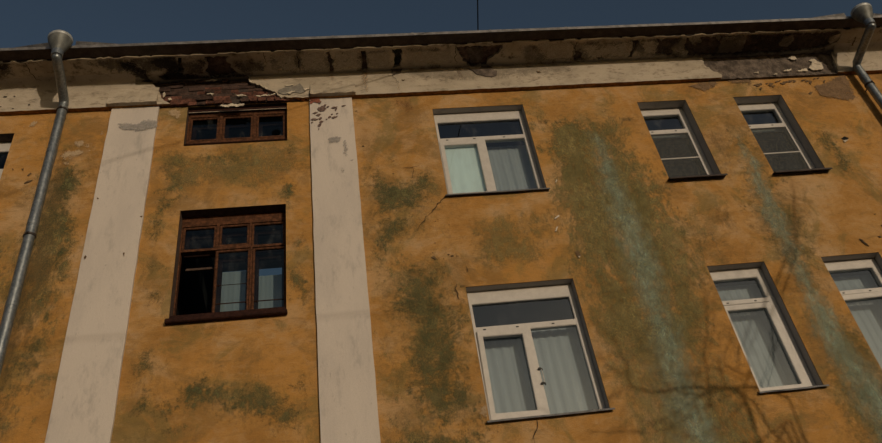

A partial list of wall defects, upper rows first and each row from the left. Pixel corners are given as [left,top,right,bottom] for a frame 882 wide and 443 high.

flaking render [145,56,346,130]
flaking render [392,49,405,81]
flaking render [457,45,502,77]
flaking render [538,31,858,101]